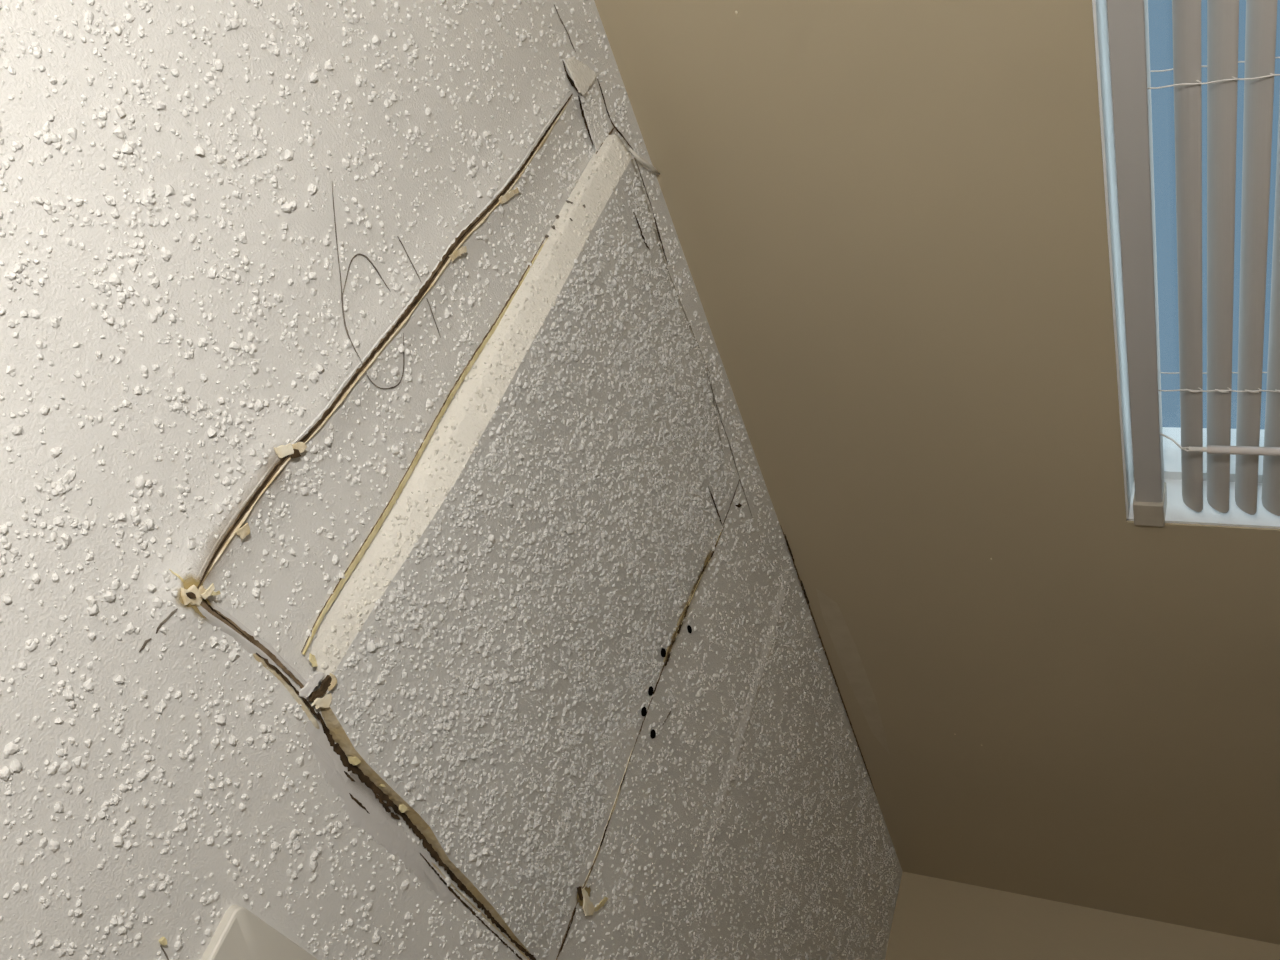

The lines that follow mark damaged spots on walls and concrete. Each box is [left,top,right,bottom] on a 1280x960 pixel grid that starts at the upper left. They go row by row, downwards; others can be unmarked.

crack [139,78,876,960]